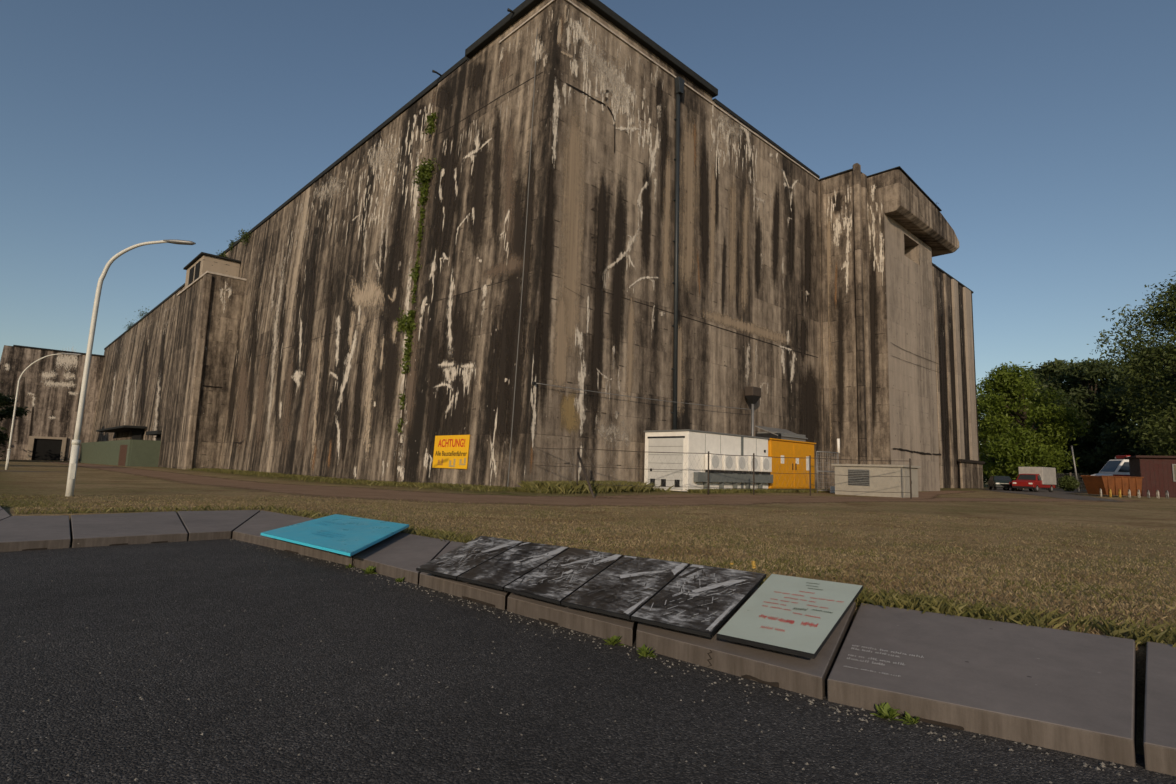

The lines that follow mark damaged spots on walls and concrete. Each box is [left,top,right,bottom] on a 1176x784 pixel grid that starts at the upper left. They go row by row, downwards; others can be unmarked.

crack [566,83,615,153]
damp [6,378,34,442]
damp [109,304,176,441]
damp [220,5,852,486]
damp [867,184,884,426]
damp [939,304,978,451]